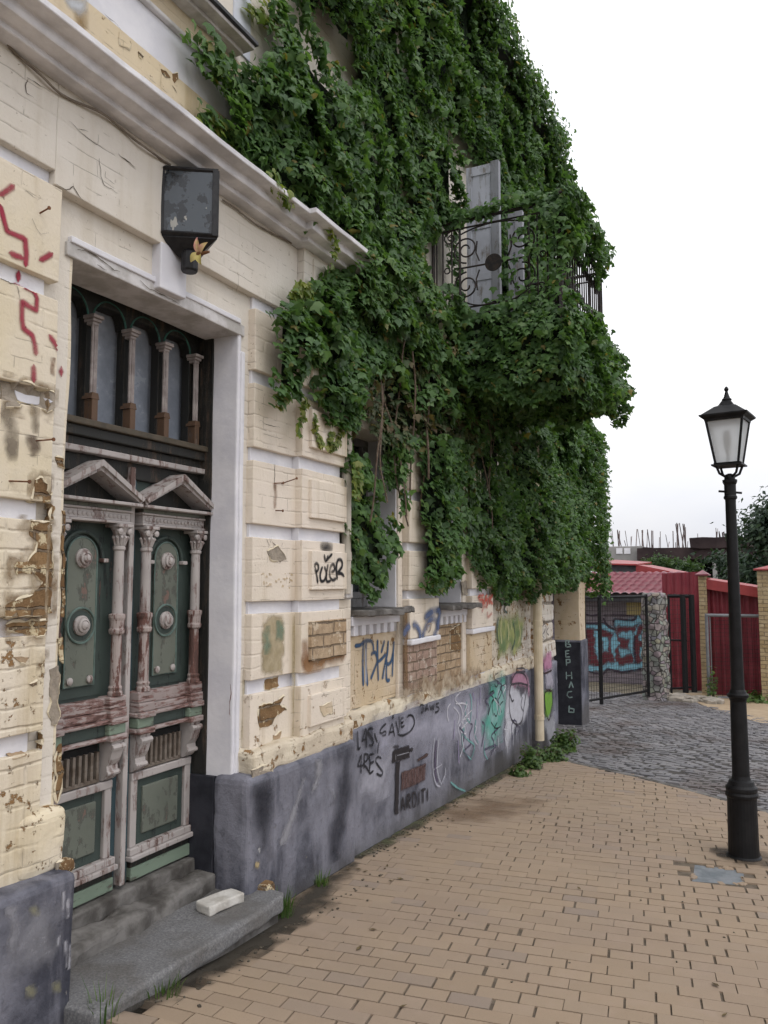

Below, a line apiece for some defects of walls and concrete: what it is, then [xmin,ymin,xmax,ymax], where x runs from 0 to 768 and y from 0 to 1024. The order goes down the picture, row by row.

peeling [0,474,66,759]
spalling [53,744,64,803]
water stain [256,787,271,842]
water stain [333,769,350,855]